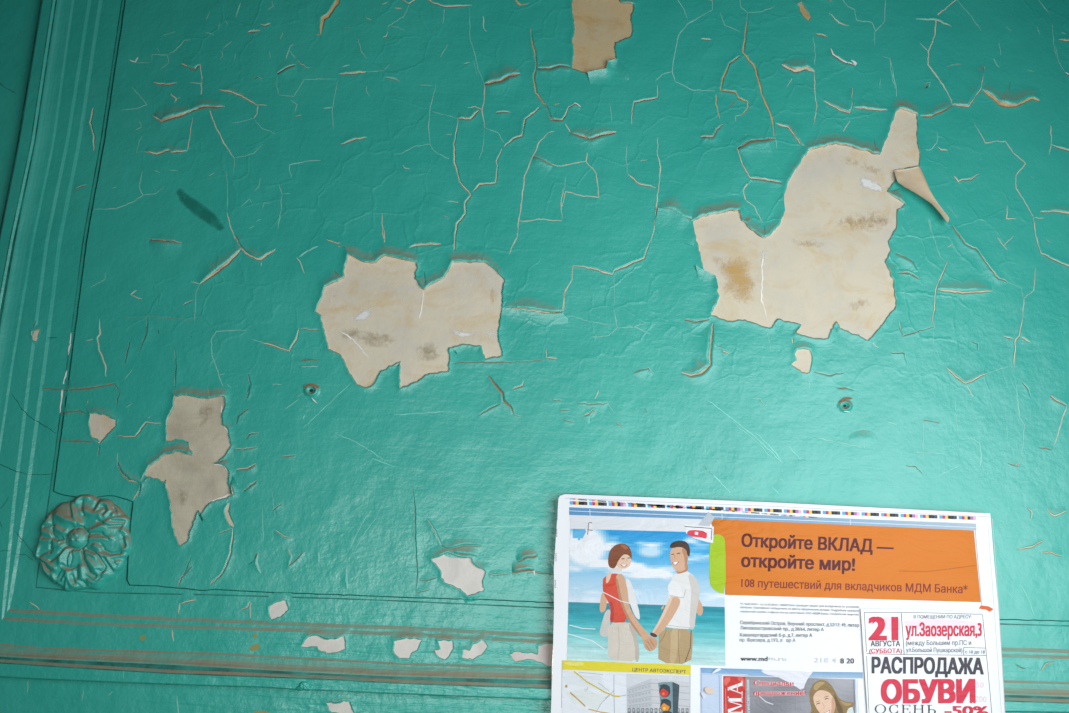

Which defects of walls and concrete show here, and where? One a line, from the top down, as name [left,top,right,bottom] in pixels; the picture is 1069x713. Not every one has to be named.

peeling [563,0,642,85]
peeling [689,94,949,379]
crack [891,0,1069,478]
peeling [83,401,123,449]
crack [42,288,185,500]
peeling [137,382,241,552]
peeling [264,593,294,624]
peeling [296,625,351,659]
peeling [307,240,568,397]
peeling [424,544,492,603]
crack [74,0,897,641]
crack [1016,502,1067,566]